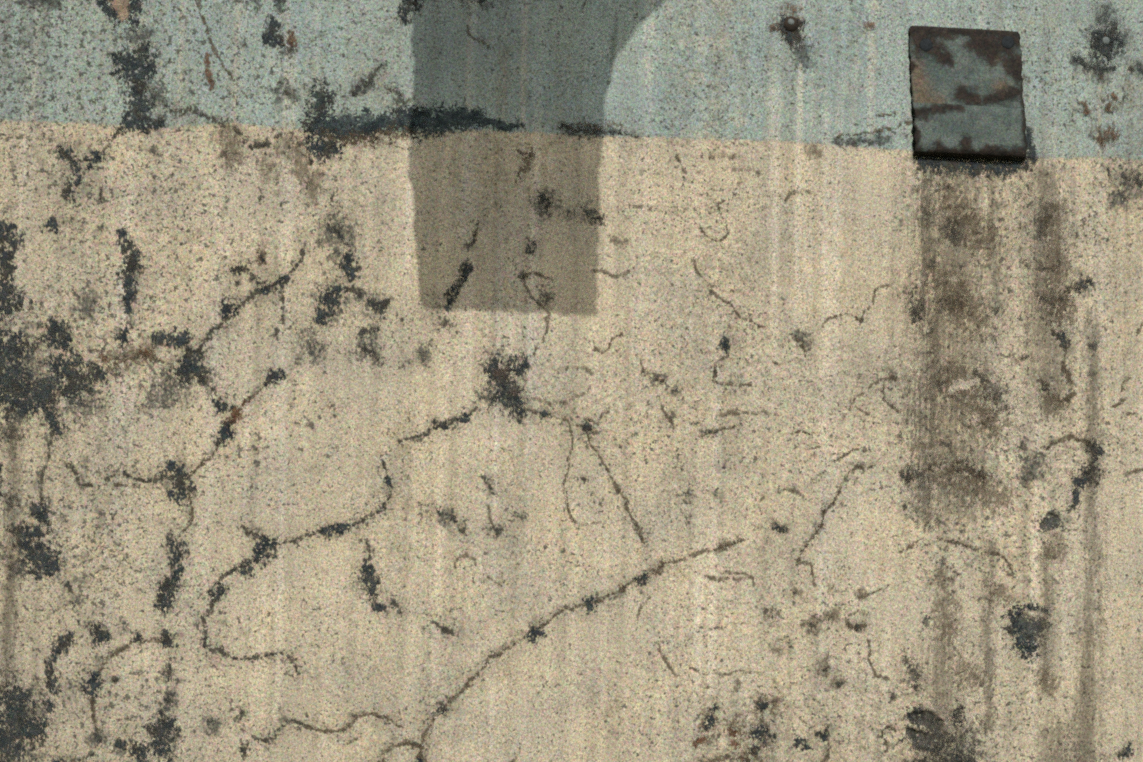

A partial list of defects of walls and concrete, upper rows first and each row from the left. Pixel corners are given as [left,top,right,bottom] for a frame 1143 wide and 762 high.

crack [56,127,122,200]
mould [109,28,312,161]
mould [255,0,297,55]
rust [1079,92,1121,145]
water stain [0,220,122,448]
water stain [114,227,144,349]
crack [38,248,305,532]
crack [691,259,779,416]
water stain [0,463,128,762]
crack [36,408,476,762]
crack [240,271,763,762]
crack [790,724,831,762]